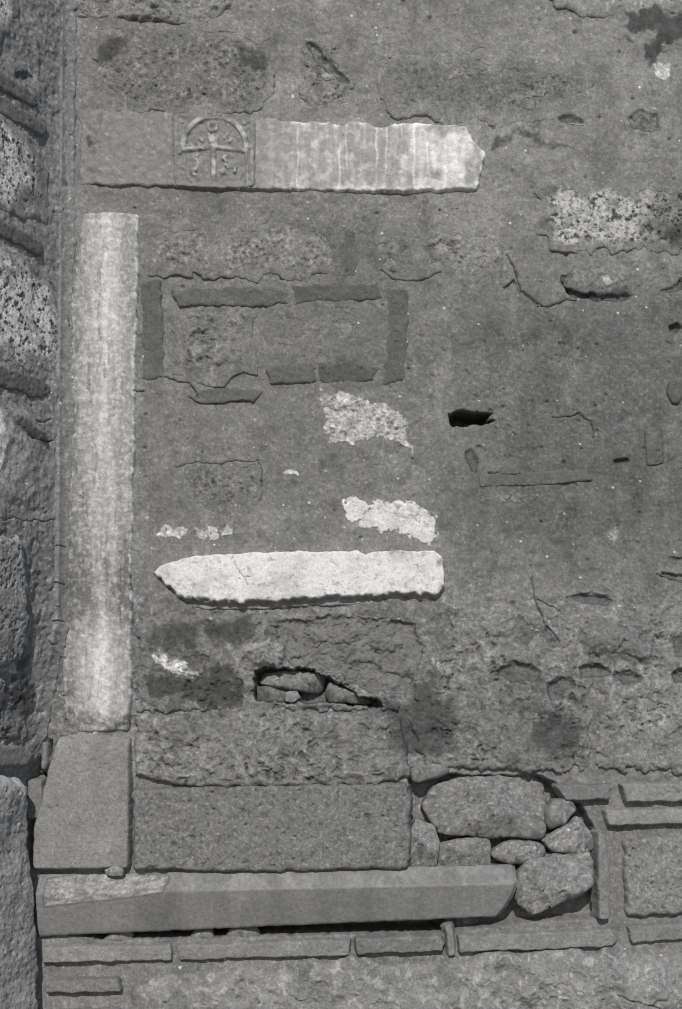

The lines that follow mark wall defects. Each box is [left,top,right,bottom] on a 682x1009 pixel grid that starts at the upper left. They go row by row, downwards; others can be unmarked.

crack [504,255,576,309]
peeling [319,391,414,455]
peeling [342,497,439,546]
crack [530,578,561,643]